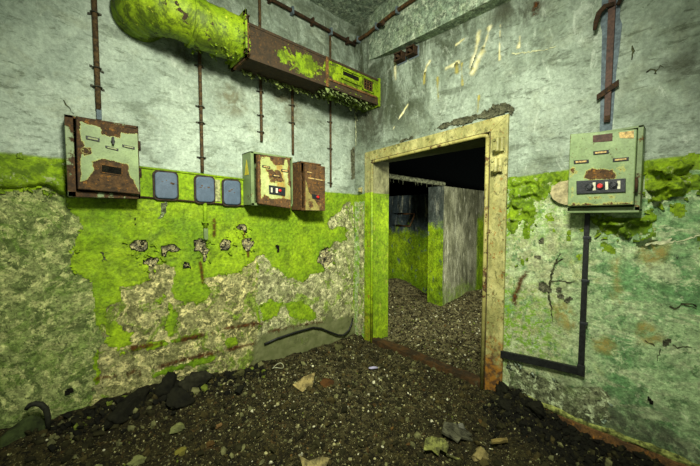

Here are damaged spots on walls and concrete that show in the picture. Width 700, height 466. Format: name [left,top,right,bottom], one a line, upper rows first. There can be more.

flaking render [434,102,515,130]
peeling [0,186,364,429]
crack [548,253,575,322]
rust [159,343,256,368]